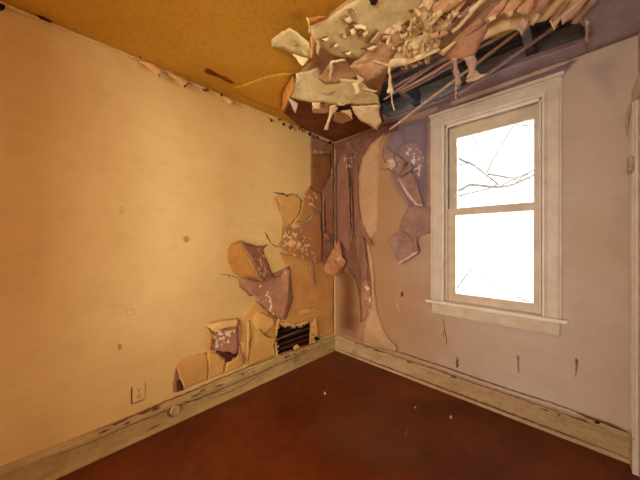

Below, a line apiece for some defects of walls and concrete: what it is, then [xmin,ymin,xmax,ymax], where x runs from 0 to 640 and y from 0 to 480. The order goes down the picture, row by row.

peeling [138,0,640,415]
peeling [61,409,170,454]
crack [337,348,628,458]